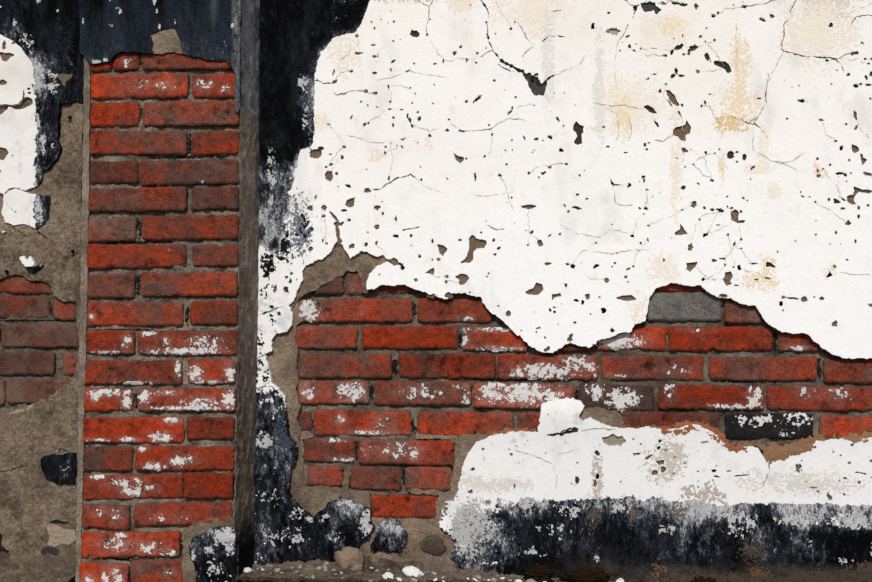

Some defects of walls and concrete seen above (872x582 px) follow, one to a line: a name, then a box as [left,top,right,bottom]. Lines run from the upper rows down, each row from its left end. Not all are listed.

peeling [522,70,547,96]
crack [615,0,681,79]
peeling [672,44,731,73]
crack [703,1,872,170]
crack [316,0,585,265]
crack [560,179,765,281]
spalling [0,19,252,582]
leakage [299,299,320,323]
efflorescence [84,331,236,424]
spalling [256,205,872,566]
leakage [707,386,813,437]
efflorescence [90,455,192,497]